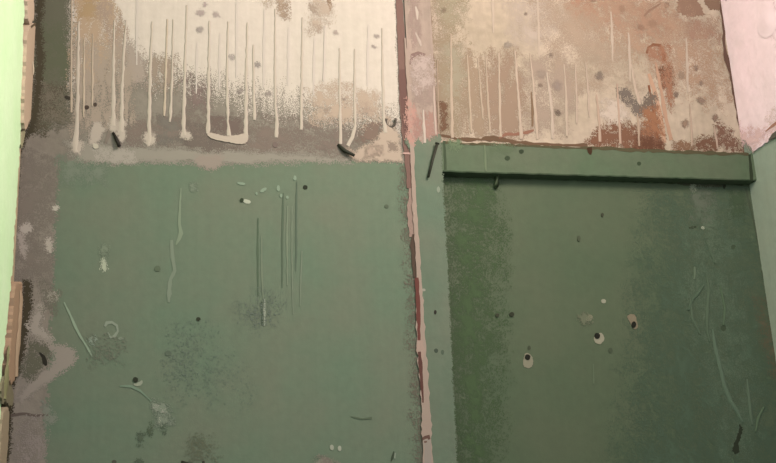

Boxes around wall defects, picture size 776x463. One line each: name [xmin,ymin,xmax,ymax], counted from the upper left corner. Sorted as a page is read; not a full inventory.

damp [28,0,182,138]
damp [114,108,385,163]
damp [403,0,584,146]
damp [615,87,659,117]
spalling [643,0,720,17]
flaking render [0,282,22,463]